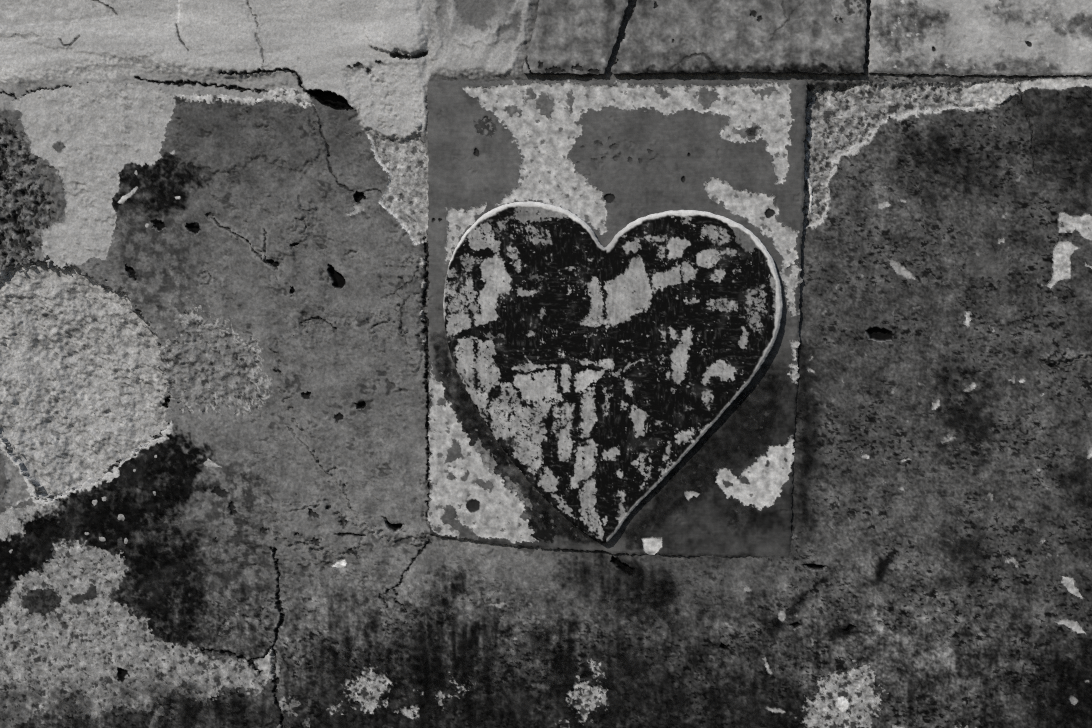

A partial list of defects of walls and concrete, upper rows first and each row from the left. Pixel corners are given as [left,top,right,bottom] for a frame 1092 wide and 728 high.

crack [0,85,70,99]
crack [135,0,307,93]
peeling [366,61,1092,316]
flaking render [0,81,313,553]
water stain [0,426,213,652]
crack [203,547,285,725]
crack [378,534,433,612]
peeling [427,369,539,543]
water stain [291,565,735,728]
water stain [432,335,780,620]
peeling [715,435,795,511]
water stain [871,556,894,584]